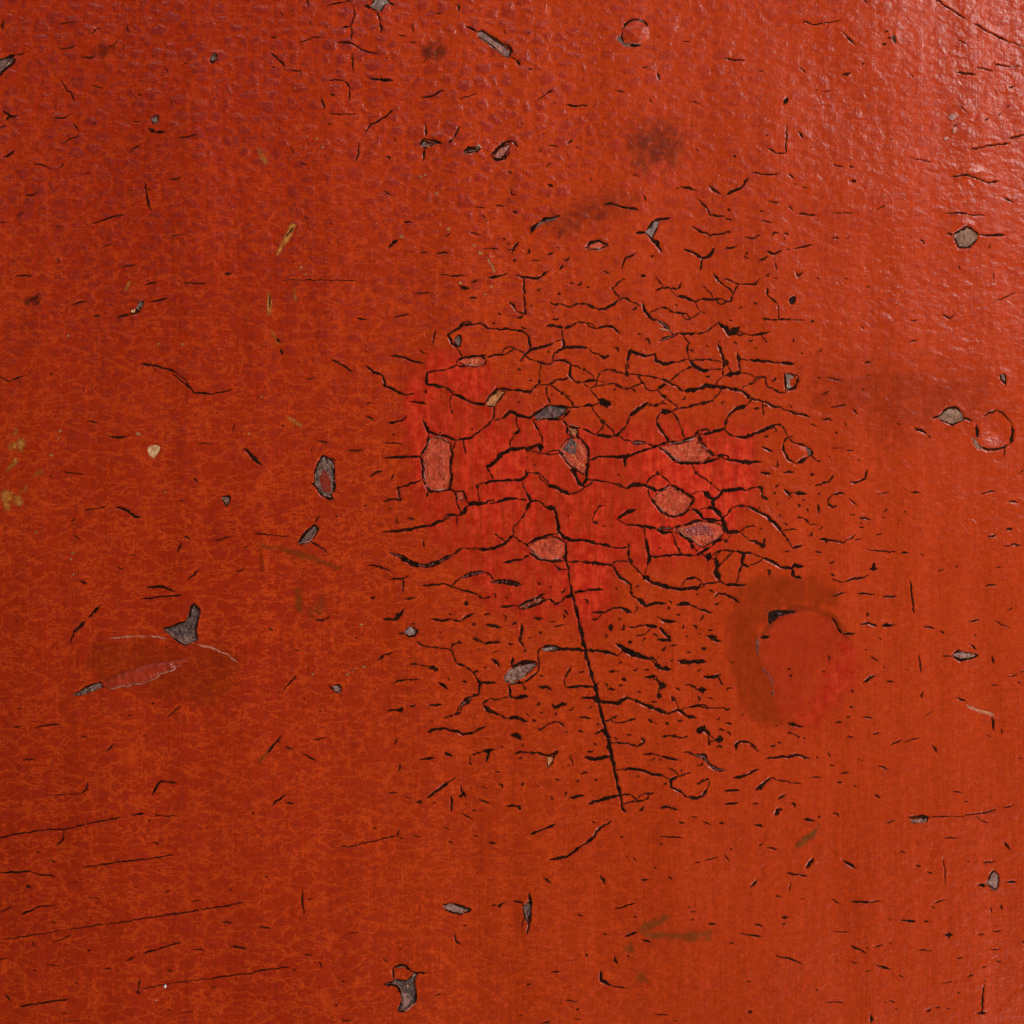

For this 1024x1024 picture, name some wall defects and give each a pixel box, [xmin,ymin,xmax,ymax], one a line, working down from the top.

peeling [948,226,1004,248]
crack [142,363,232,395]
peeling [312,455,336,500]
peeling [384,419,482,524]
crack [177,533,280,573]
crack [311,97,958,989]
crack [986,528,1020,586]
peeling [73,603,201,696]
peeling [504,645,559,685]
crack [0,780,322,1022]
crack [832,791,1024,1015]
peeling [384,964,425,1012]